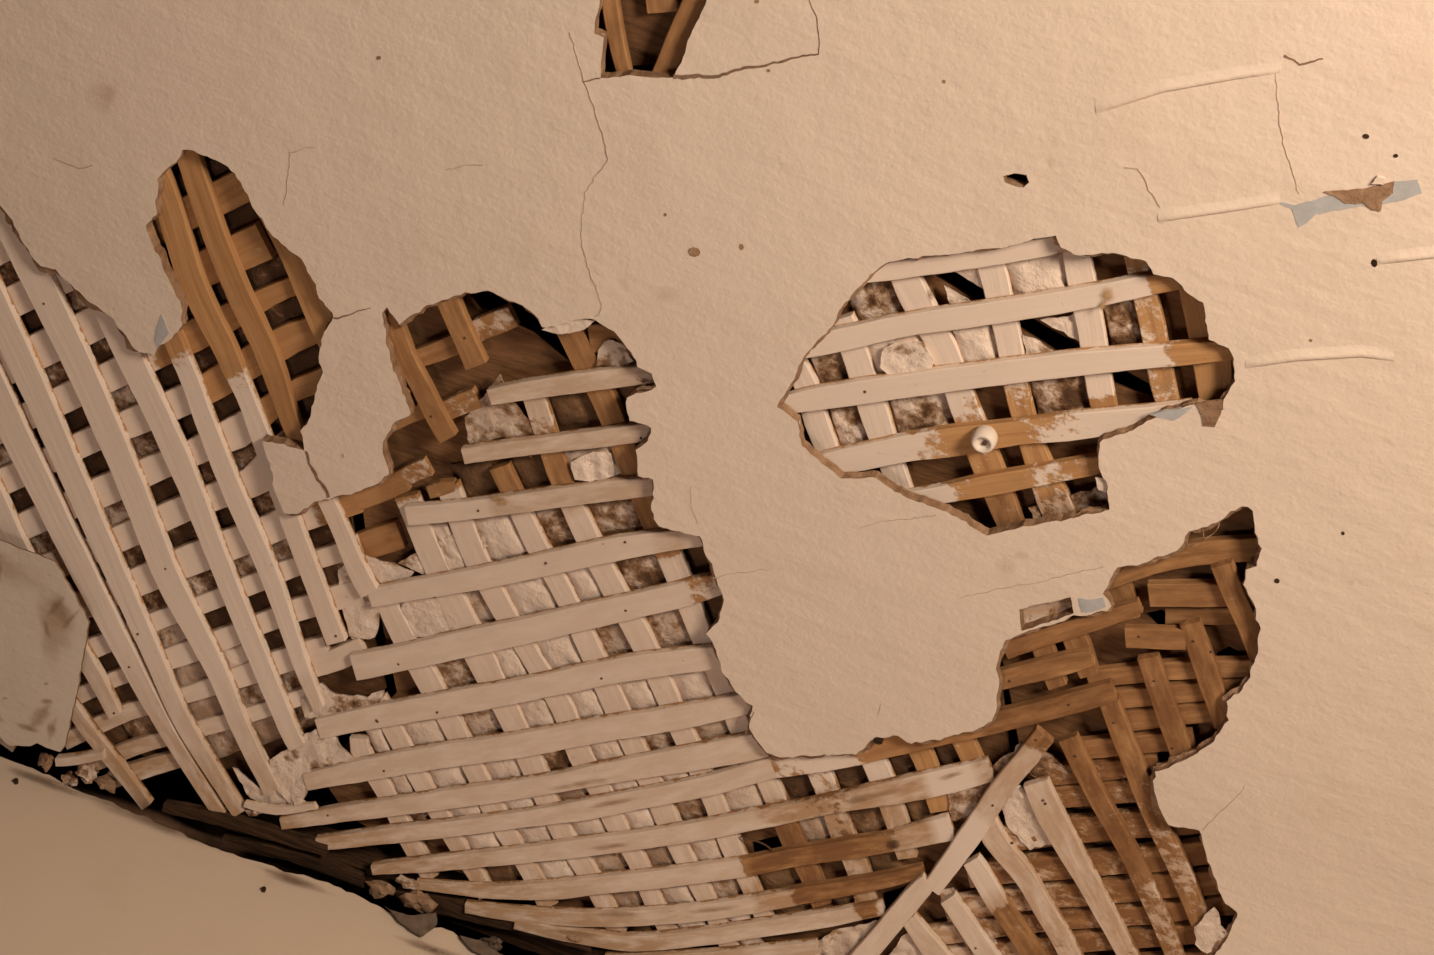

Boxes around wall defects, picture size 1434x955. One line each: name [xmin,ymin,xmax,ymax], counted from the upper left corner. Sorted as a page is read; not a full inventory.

crack [673,0,820,80]
flaking render [0,206,106,314]
flaking render [353,291,633,494]
crack [569,32,609,317]
flaking render [778,254,952,408]
flaking render [1051,426,1136,519]
flaking render [1057,240,1235,427]
peeling [1280,175,1422,228]
flaking render [633,420,894,760]
flaking render [912,506,1245,745]
flaking render [1150,650,1258,827]
peeling [386,907,437,937]